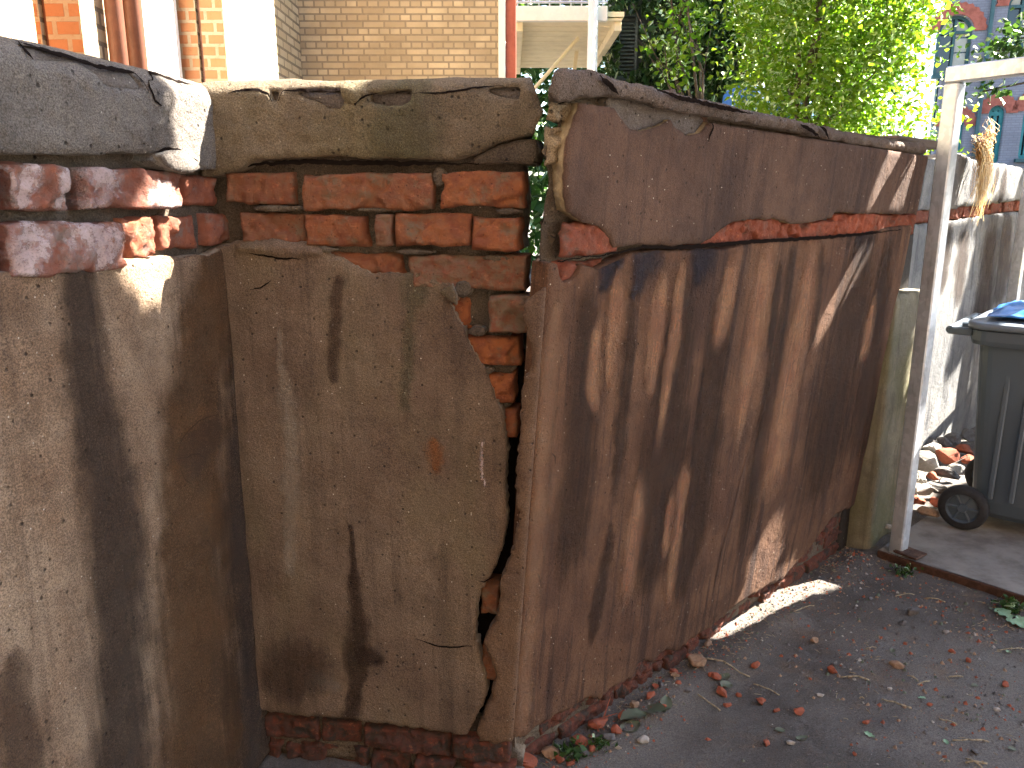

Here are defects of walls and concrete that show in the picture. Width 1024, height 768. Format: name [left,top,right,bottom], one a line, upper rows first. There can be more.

crack [10,37,193,106]
water stain [0,163,53,277]
water stain [150,182,181,209]
flaking render [0,150,532,437]
water stain [329,276,343,383]
flaking render [551,221,617,281]
flaking render [682,210,929,245]
flaking render [949,200,1020,220]
water stain [55,166,150,768]
crack [418,349,526,648]
water stain [342,525,383,721]
crack [479,680,494,712]